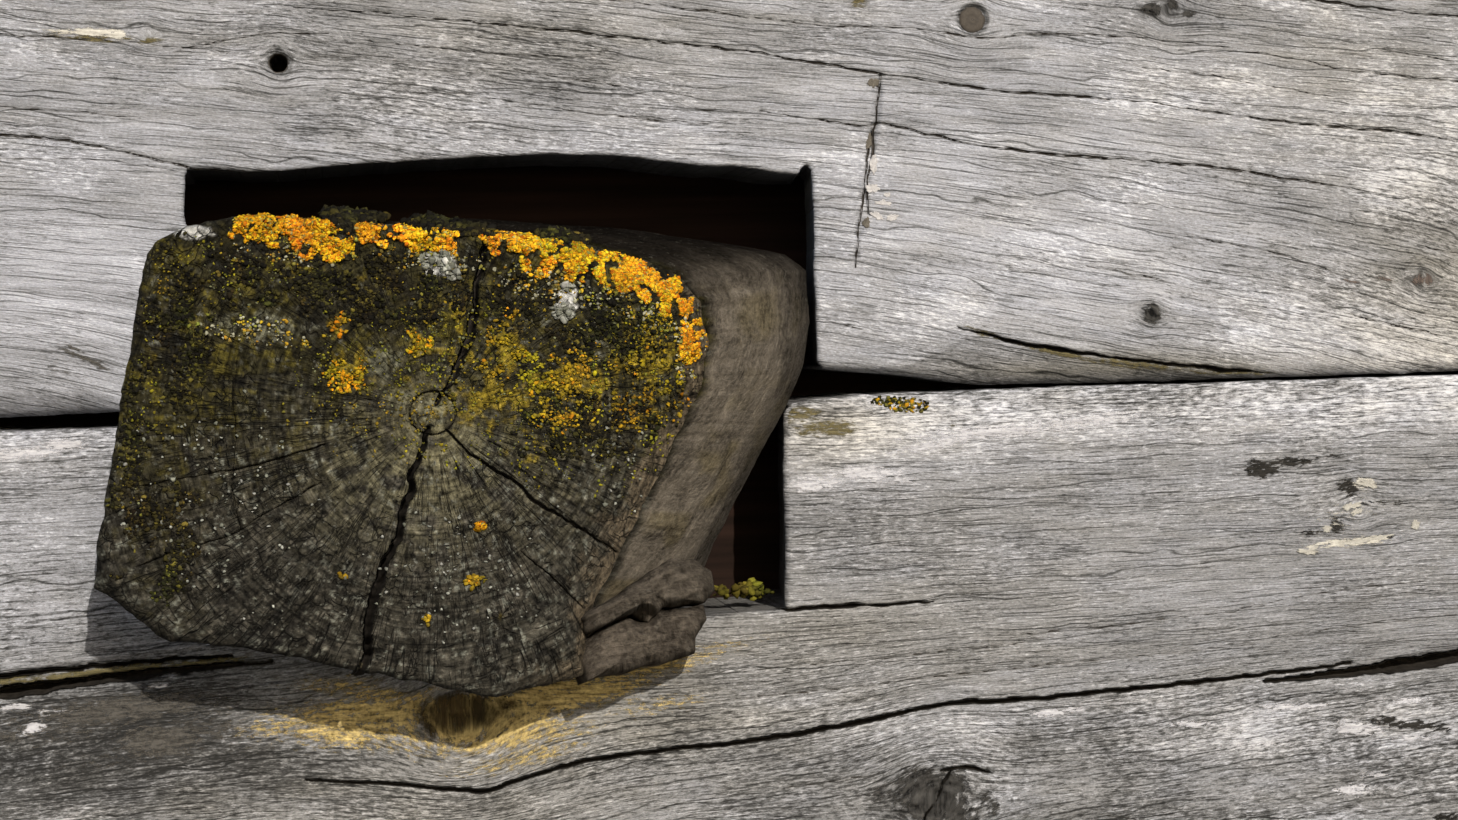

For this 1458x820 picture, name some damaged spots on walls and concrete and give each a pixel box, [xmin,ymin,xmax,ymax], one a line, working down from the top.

crack [958,327,1268,373]
crack [354,240,617,676]
crack [306,581,1458,794]